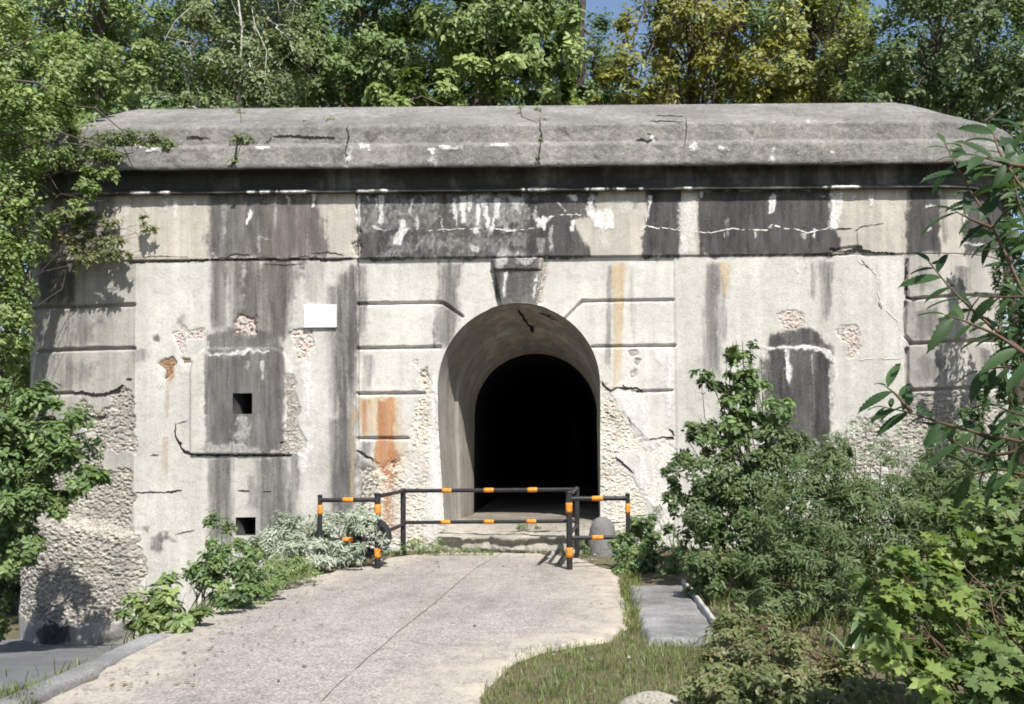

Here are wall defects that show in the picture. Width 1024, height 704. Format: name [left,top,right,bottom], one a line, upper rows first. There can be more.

spalling [35,386,138,538]
flaking render [159,326,204,379]
crack [150,421,291,457]
water stain [204,190,327,555]
flaking render [290,328,313,360]
corrosion [363,397,400,516]
spalling [358,361,445,550]
crack [517,310,557,333]
water stain [331,185,873,517]
spalling [600,383,677,548]
crack [641,209,921,360]
flaking render [777,310,804,330]